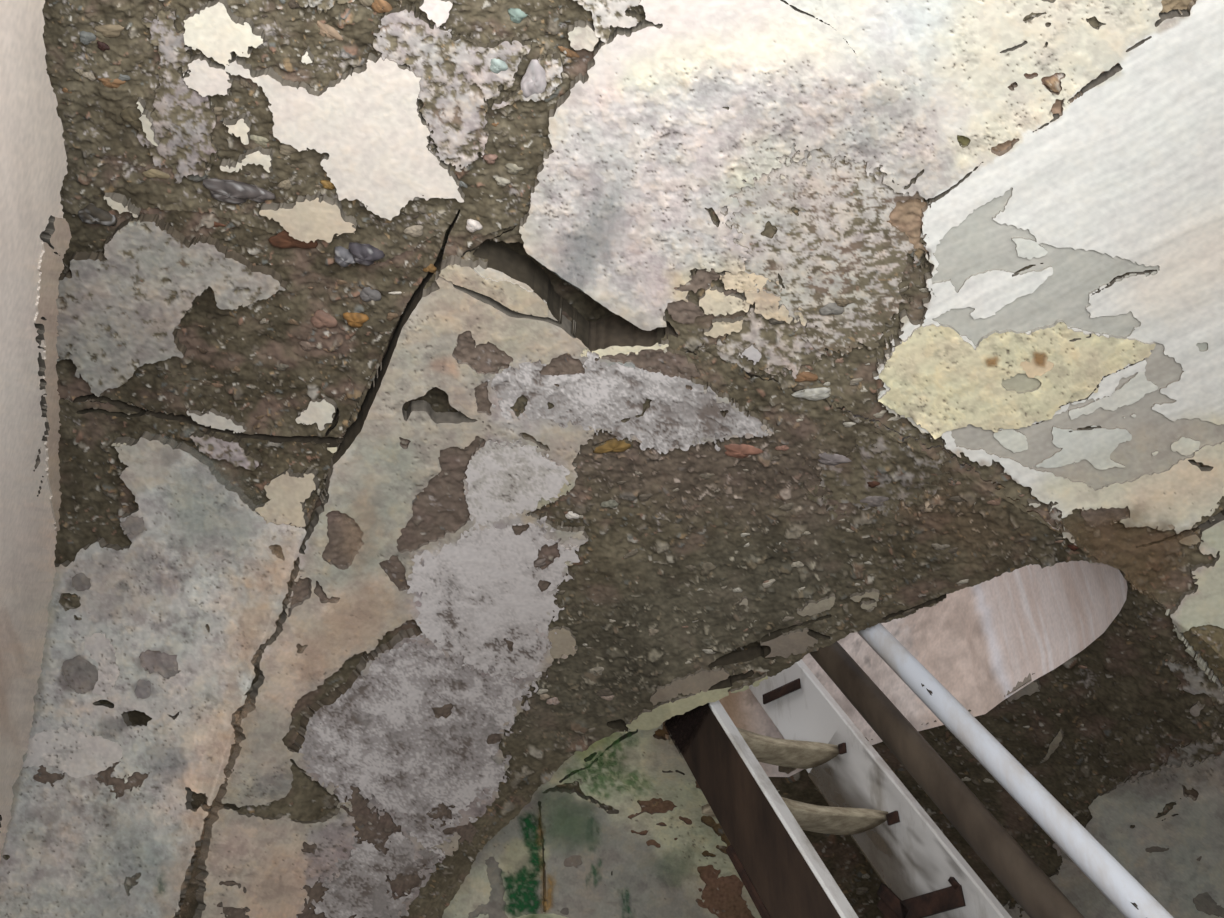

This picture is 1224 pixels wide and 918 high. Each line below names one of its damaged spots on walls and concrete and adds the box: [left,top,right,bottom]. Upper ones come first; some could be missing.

spalling [1086,16,1106,30]
spalling [1008,63,1119,116]
spalling [991,138,1019,156]
spalling [36,0,663,570]
crack [33,209,678,918]
spalling [379,143,1224,918]
crack [882,594,946,620]
water stain [296,438,580,918]
crack [708,614,832,691]
spalling [121,710,152,727]
spalling [236,619,422,855]
spalling [95,757,149,799]